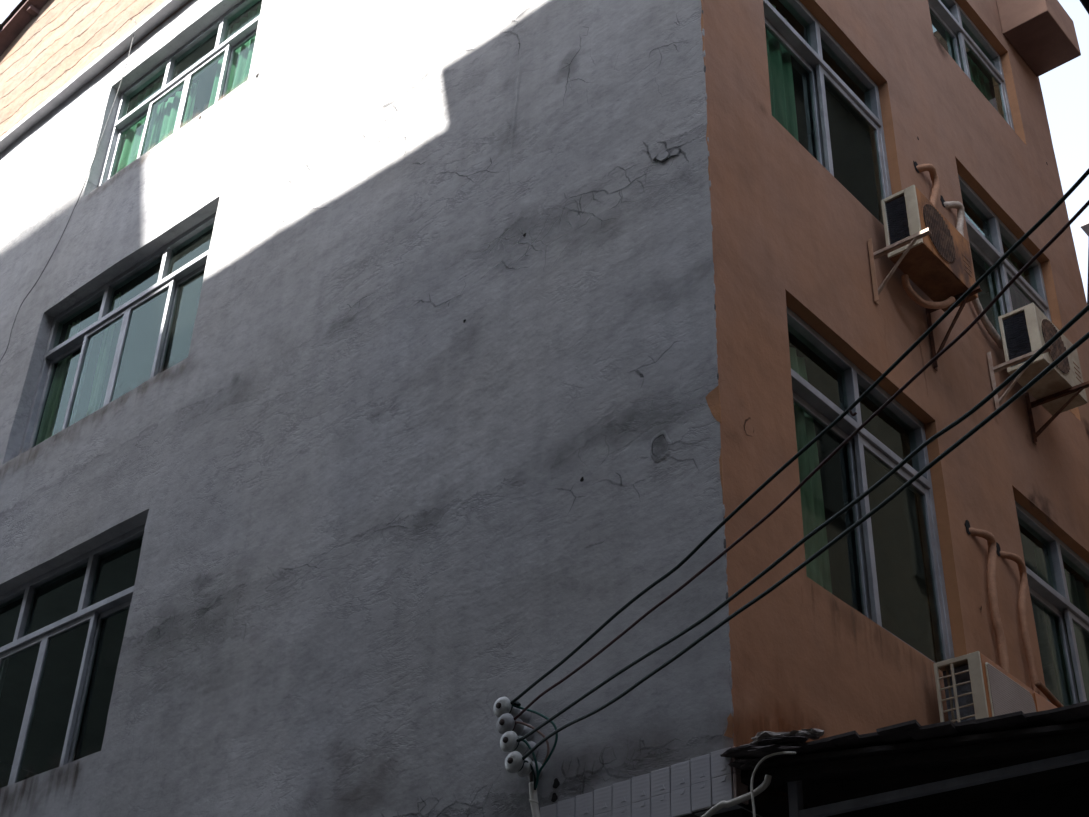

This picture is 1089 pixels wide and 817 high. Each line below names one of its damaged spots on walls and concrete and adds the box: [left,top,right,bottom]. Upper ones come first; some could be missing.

crack [565,142,685,213]